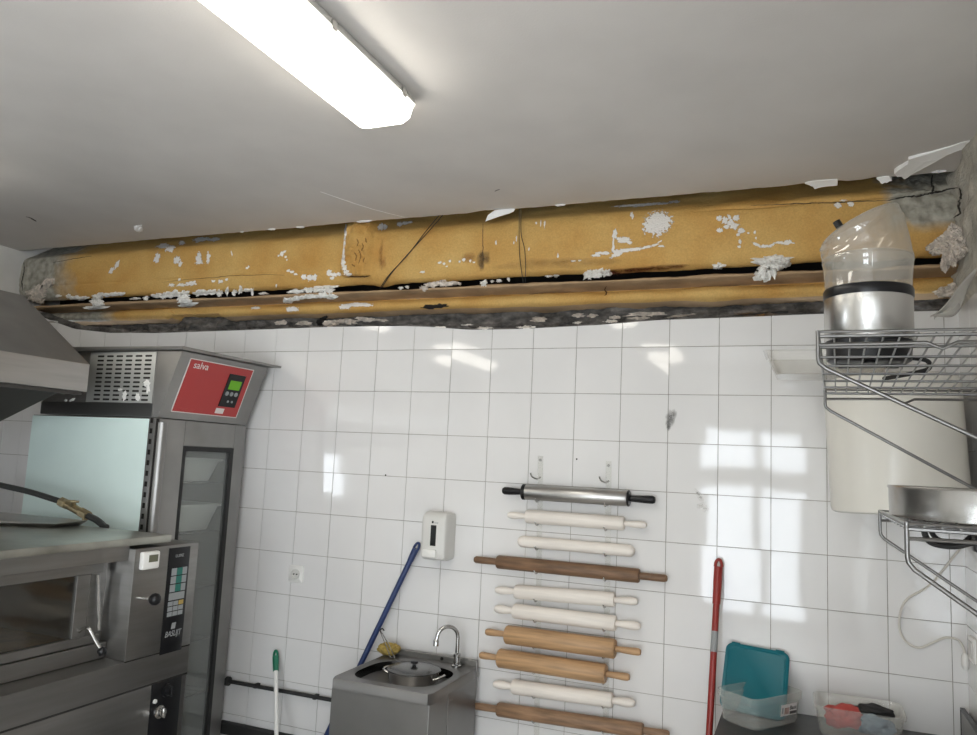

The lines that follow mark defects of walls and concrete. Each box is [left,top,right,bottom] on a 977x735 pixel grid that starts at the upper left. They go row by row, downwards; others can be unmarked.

peeling [805,179,838,189]
crack [753,175,962,218]
peeling [486,209,515,221]
peeling [592,200,679,259]
peeling [716,215,795,248]
peeling [153,237,220,287]
spalling [278,220,412,282]
spalling [275,302,388,327]
spalling [517,316,547,329]
spalling [572,312,695,324]